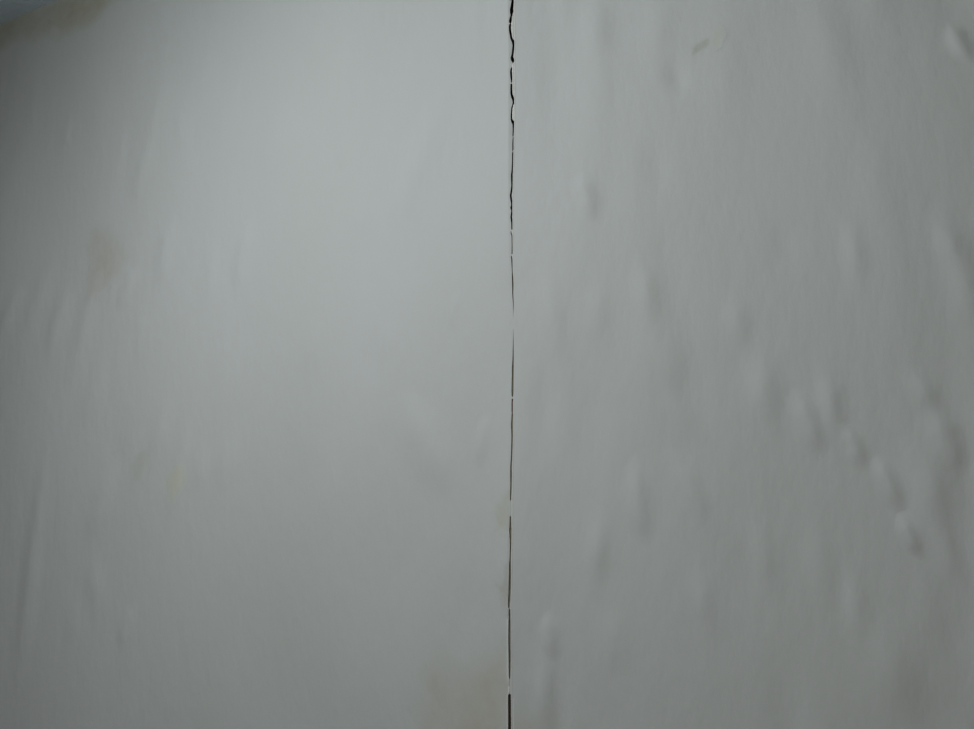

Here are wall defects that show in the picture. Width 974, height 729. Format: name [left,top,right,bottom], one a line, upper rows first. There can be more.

crack [508,0,516,312]
crack [507,339,515,729]